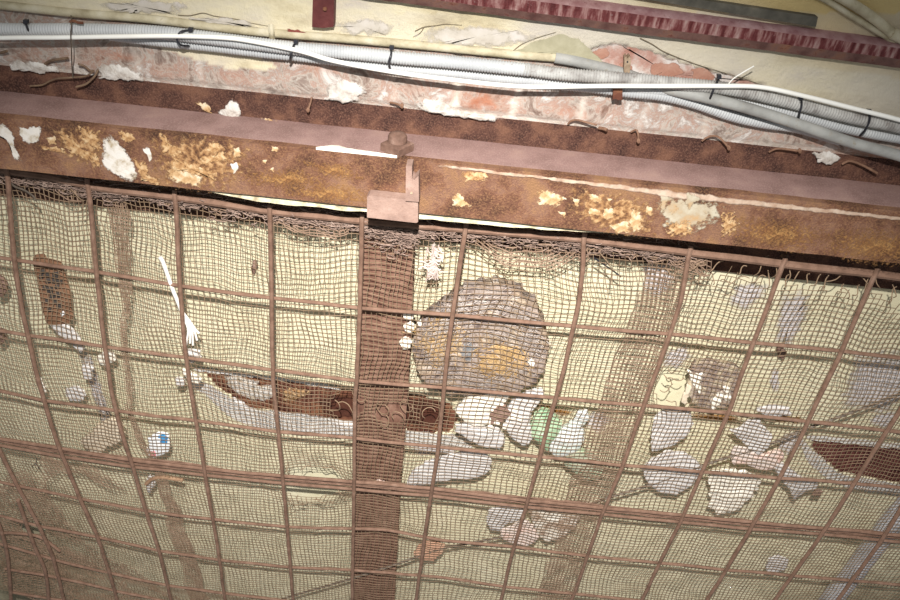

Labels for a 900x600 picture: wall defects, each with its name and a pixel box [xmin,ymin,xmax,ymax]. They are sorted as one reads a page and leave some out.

flaking render [426,27,755,84]
peeling [0,124,251,192]
rust [245,160,364,204]
peeling [446,165,900,237]
rust [727,216,900,267]
peeling [777,296,807,344]
flaking render [192,367,354,436]
flaking render [406,394,473,454]